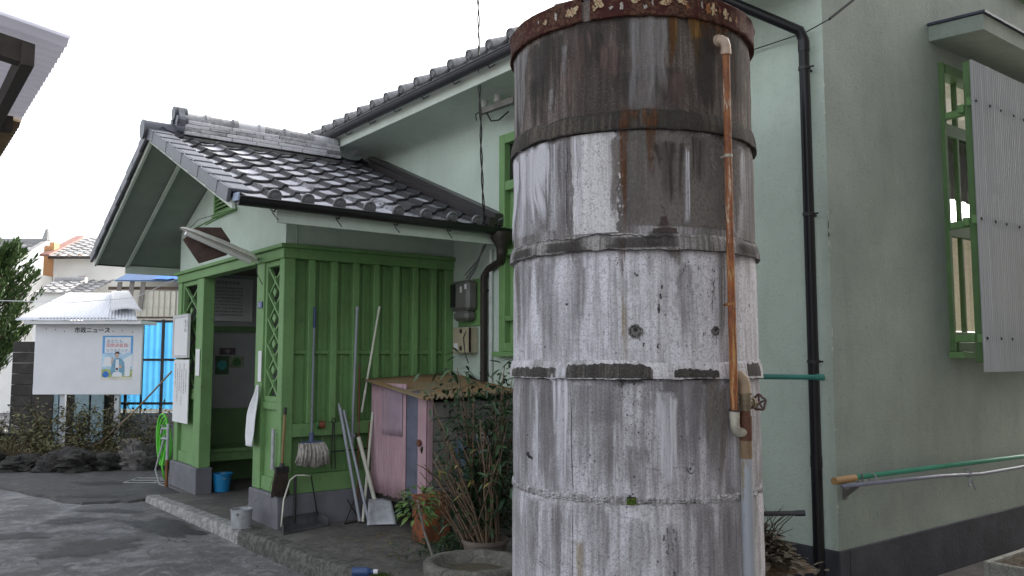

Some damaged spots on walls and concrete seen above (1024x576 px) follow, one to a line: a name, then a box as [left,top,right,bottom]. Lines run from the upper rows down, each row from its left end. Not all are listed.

leakage [514,18,716,131]
leakage [729,34,746,103]
leakage [512,143,555,234]
corrosion [619,106,657,213]
leakage [610,132,743,286]
leakage [513,240,584,341]
leakage [551,366,568,471]
leakage [657,393,677,477]